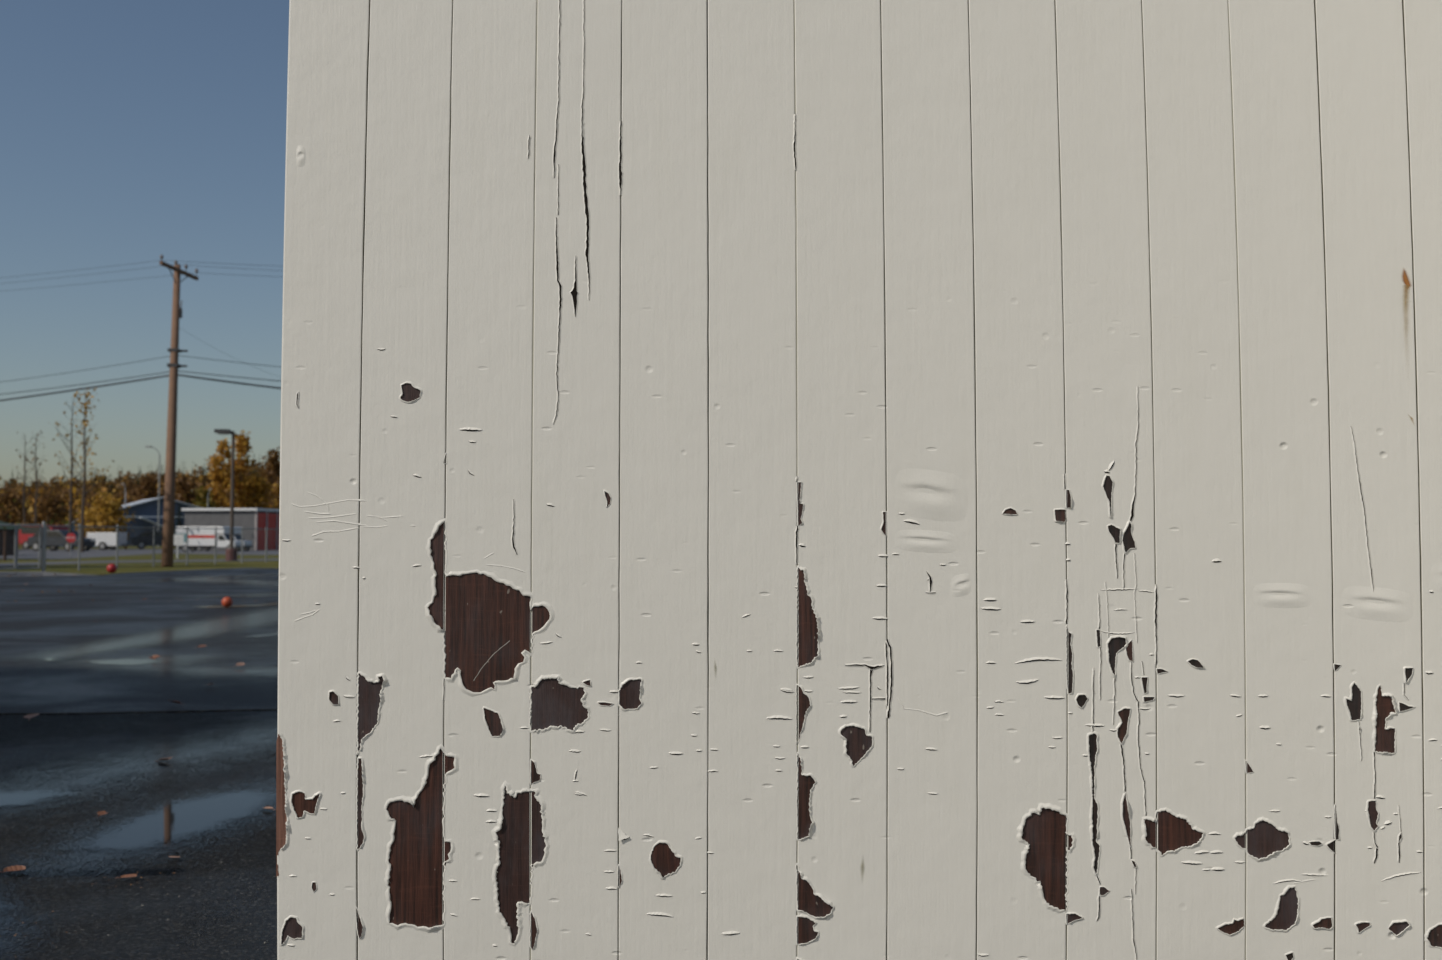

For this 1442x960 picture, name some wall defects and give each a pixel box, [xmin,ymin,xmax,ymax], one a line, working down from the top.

crack [527,0,624,425]
peeling [328,671,388,852]
peeling [383,743,459,933]
peeling [491,759,550,950]
peeling [424,518,644,738]
peeling [795,566,822,842]
peeling [795,863,836,960]
peeling [837,723,875,768]
peeling [1016,624,1168,925]
peeling [1120,791,1206,868]
peeling [1215,885,1334,937]
peeling [1232,803,1340,862]